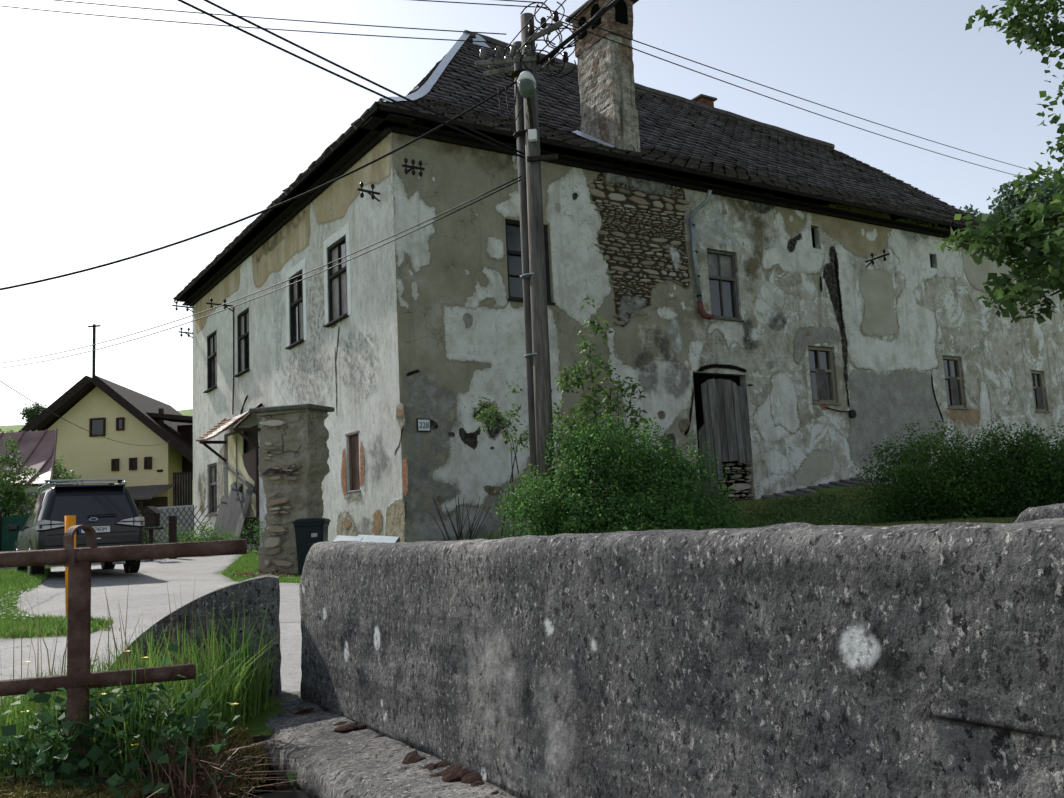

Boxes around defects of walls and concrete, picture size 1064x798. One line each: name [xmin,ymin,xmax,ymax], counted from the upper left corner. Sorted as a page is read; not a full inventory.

peeling [194,136,438,333]
flaking render [336,442,365,536]
flaking render [372,458,408,542]
flaking render [395,402,405,429]
flaking render [430,235,530,515]
flaking render [495,189,520,219]
flaking render [543,167,746,459]
flaking render [753,332,834,490]
flaking render [749,193,1015,374]